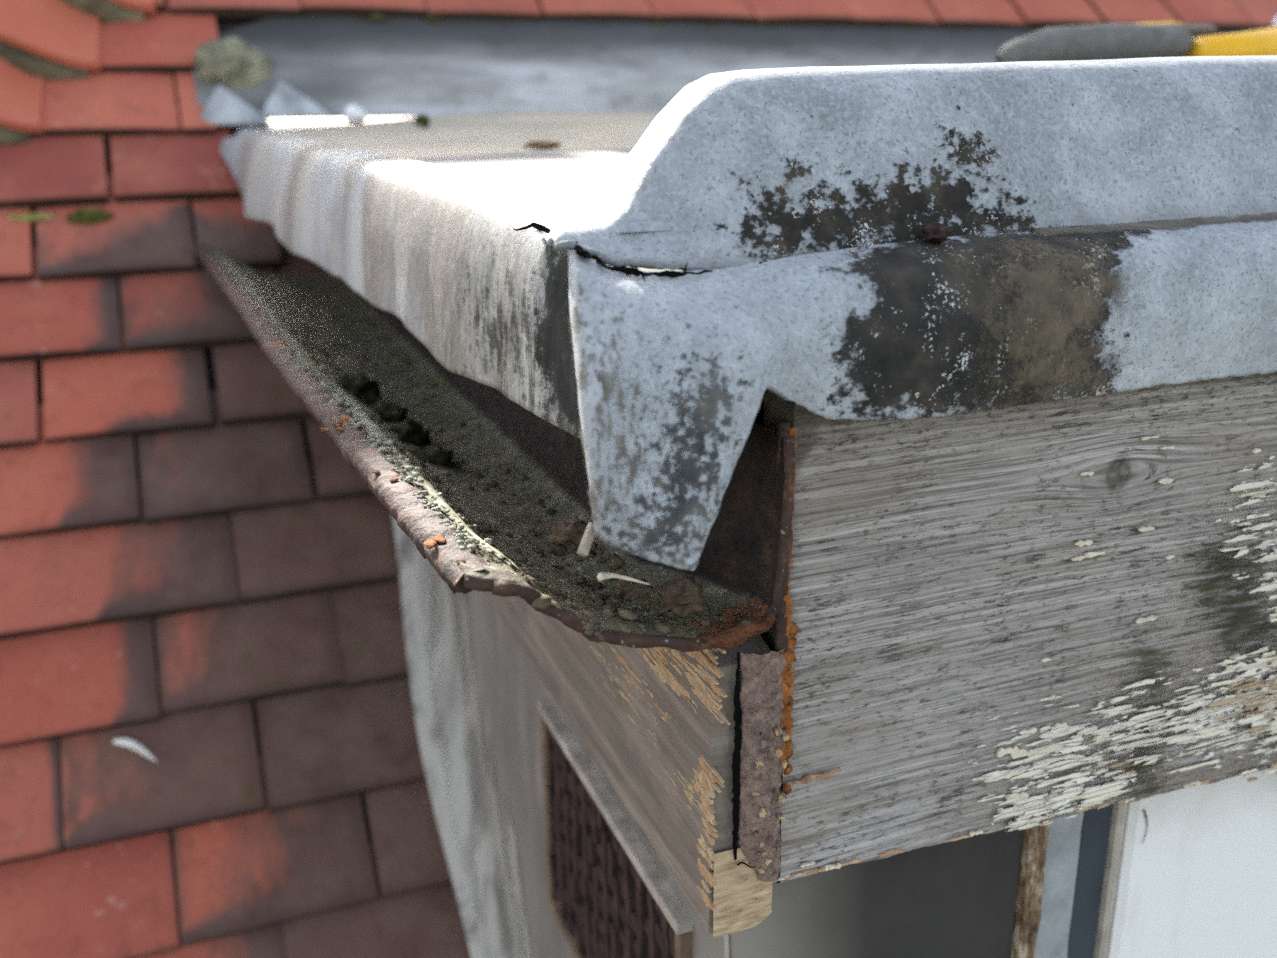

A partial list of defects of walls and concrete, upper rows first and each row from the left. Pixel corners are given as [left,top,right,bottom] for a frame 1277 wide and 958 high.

rust [423,535,446,549]
damp [453,226,762,570]
crack [513,222,713,281]
peeling [492,580,862,911]
rust [691,522,841,795]
damp [714,105,1277,421]
peeling [947,448,1277,842]